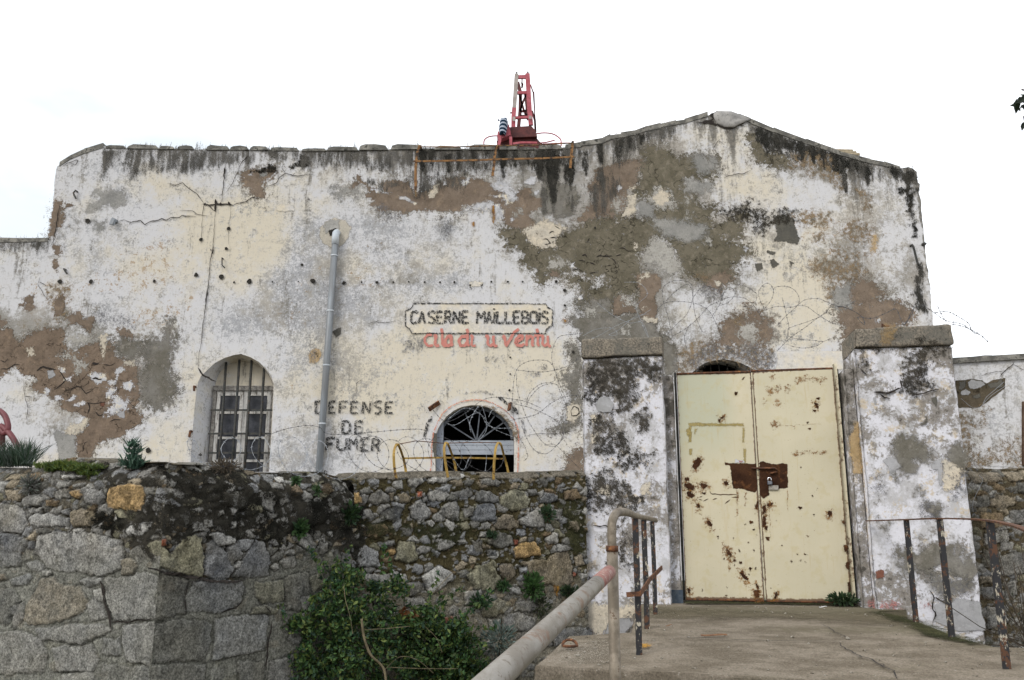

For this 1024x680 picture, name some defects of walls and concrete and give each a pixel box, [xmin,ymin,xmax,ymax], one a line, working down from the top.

spalling [0,193,154,458]
crack [121,151,312,381]
flaking render [234,159,286,210]
leakage [101,121,676,219]
flaking render [346,136,800,381]
leakage [719,197,802,240]
flaking render [740,126,797,177]
leakage [752,127,921,238]
leakage [910,262,929,314]
spalling [955,378,1005,409]
corrosion [680,455,845,604]